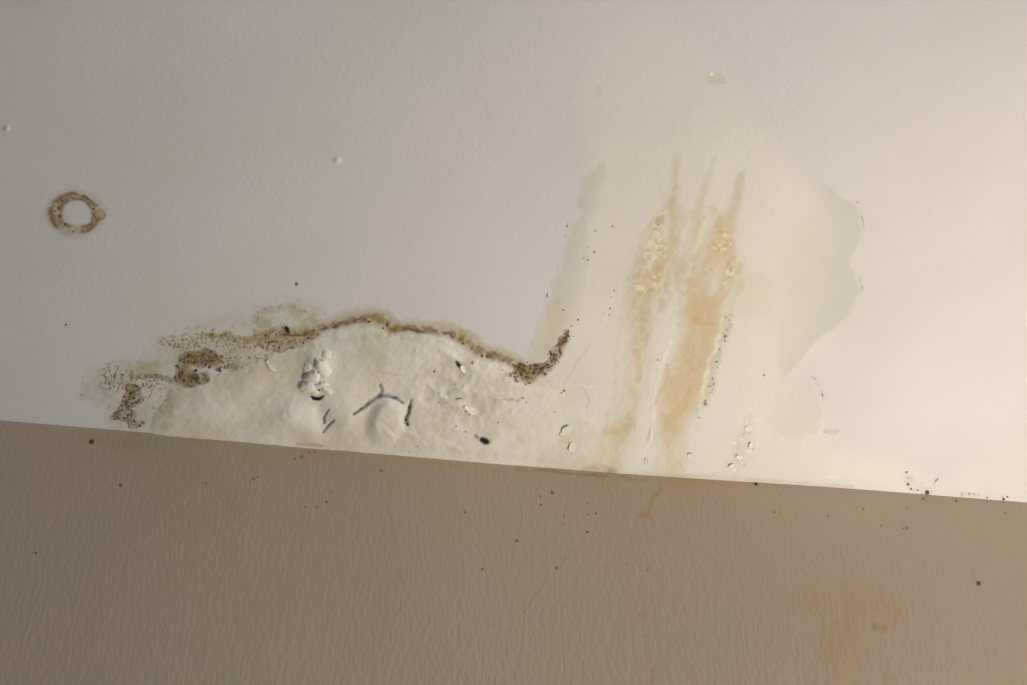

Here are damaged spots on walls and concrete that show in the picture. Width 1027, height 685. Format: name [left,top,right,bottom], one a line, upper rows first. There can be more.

leakage [42,186,109,240]
leakage [72,0,1027,502]
rust [373,151,786,543]